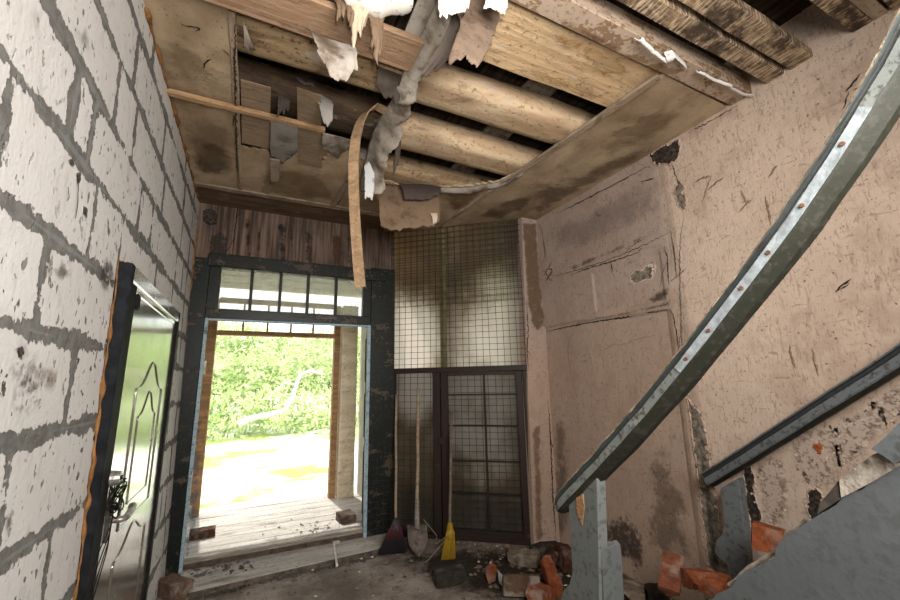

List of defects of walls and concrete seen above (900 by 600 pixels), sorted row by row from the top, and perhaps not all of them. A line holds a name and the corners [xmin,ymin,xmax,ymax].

spalling [649,138,682,166]
crack [526,220,685,370]
spalling [630,263,656,284]
peeling [743,385,900,540]